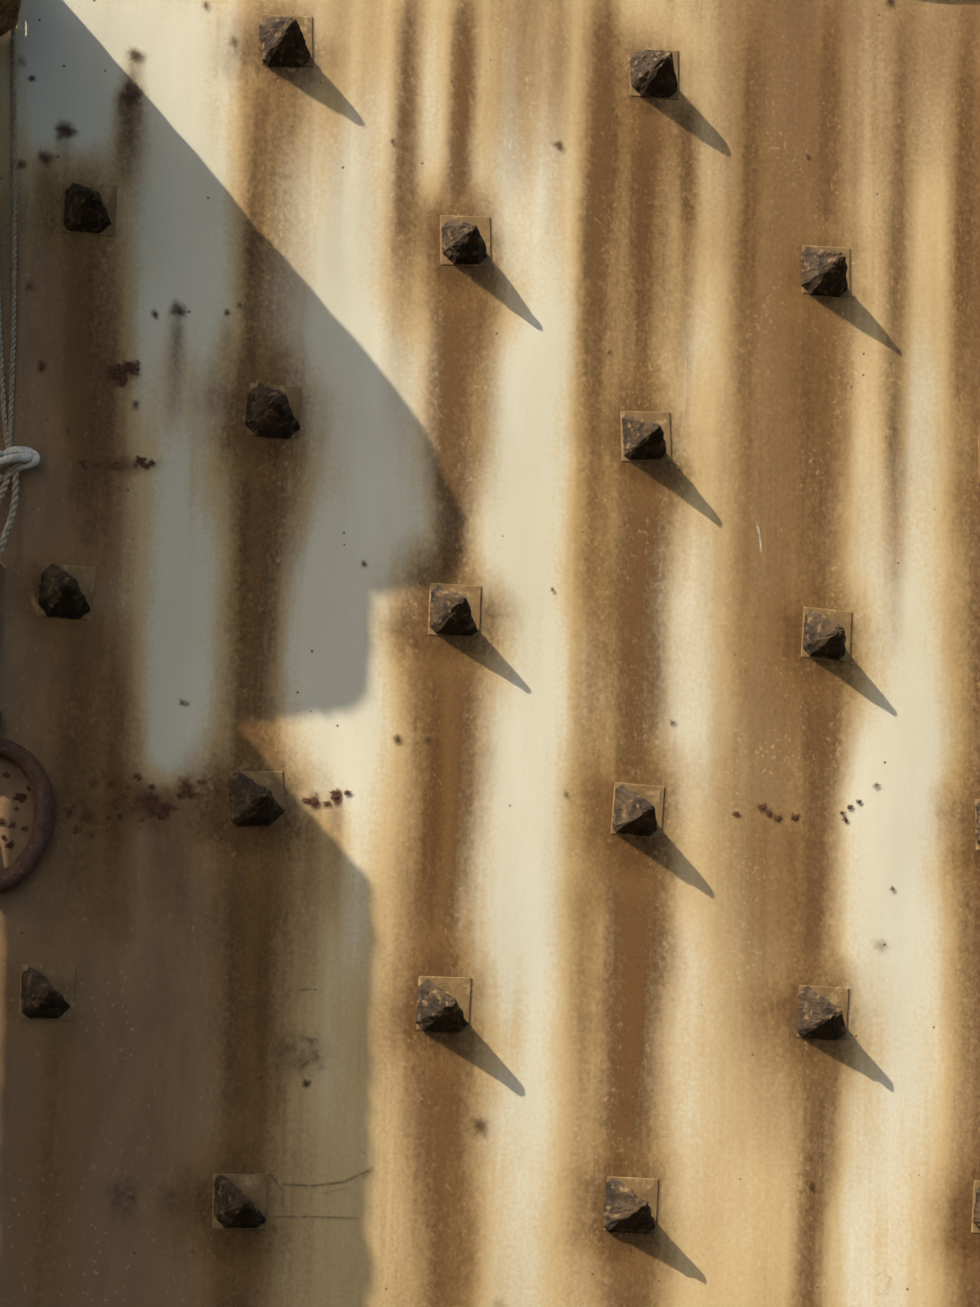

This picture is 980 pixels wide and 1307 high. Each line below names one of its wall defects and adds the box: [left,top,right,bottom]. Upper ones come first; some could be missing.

rust [57,124,76,137]
rust [106,361,140,387]
rust [119,50,141,170]
rust [152,304,185,355]
rust [216,10,317,760]
rust [740,47,761,362]
rust [887,46,908,491]
rust [64,770,221,838]
rust [302,788,351,809]
rust [391,0,496,1307]
rust [583,0,696,1307]
rust [758,295,861,1307]